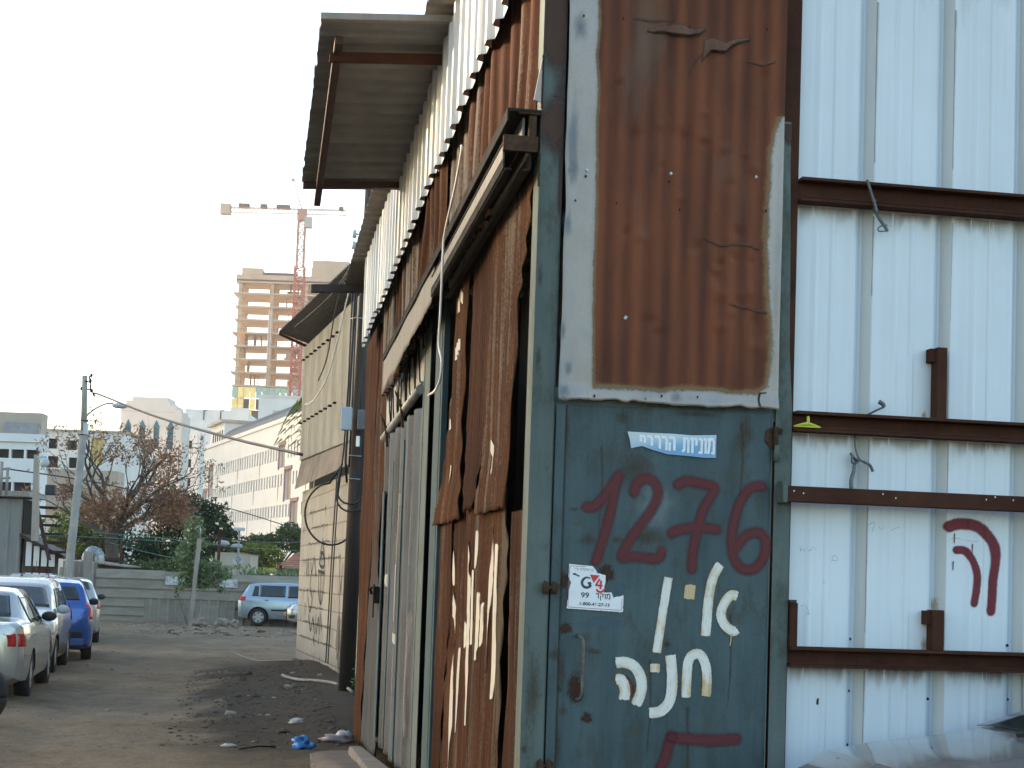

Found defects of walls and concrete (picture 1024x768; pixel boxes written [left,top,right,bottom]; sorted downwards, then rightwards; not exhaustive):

corrosion [592,0,792,395]